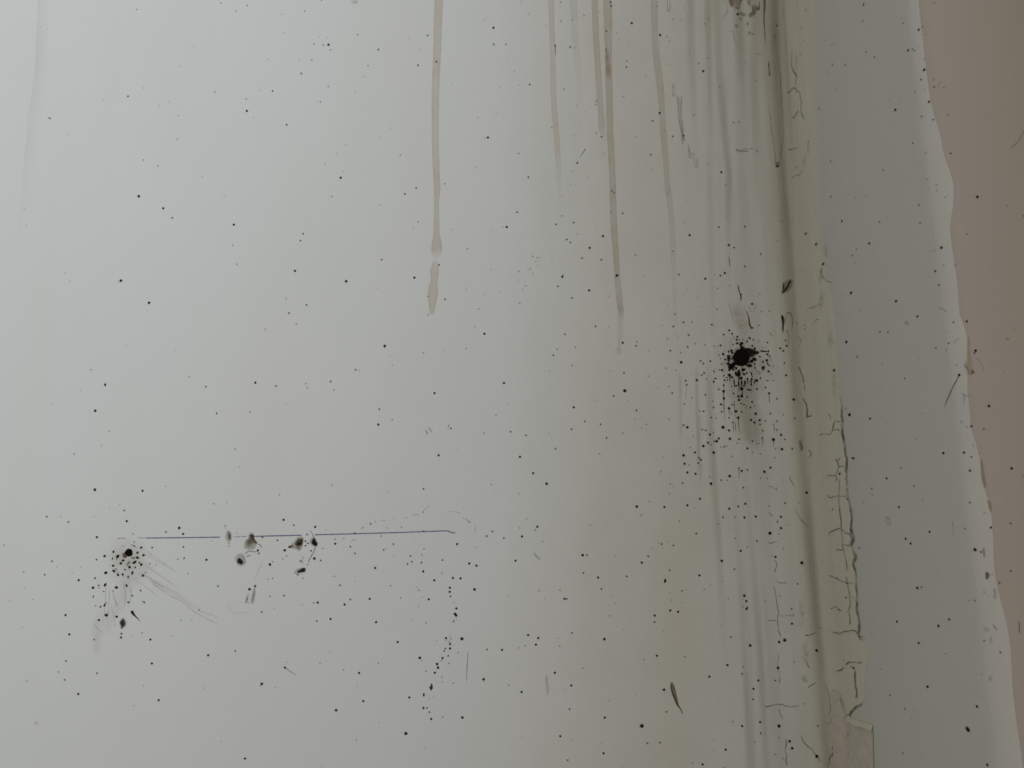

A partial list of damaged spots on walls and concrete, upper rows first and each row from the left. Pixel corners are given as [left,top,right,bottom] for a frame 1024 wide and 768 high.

mould [682,315,795,484]
peeling [744,0,874,768]
crack [799,368,861,697]